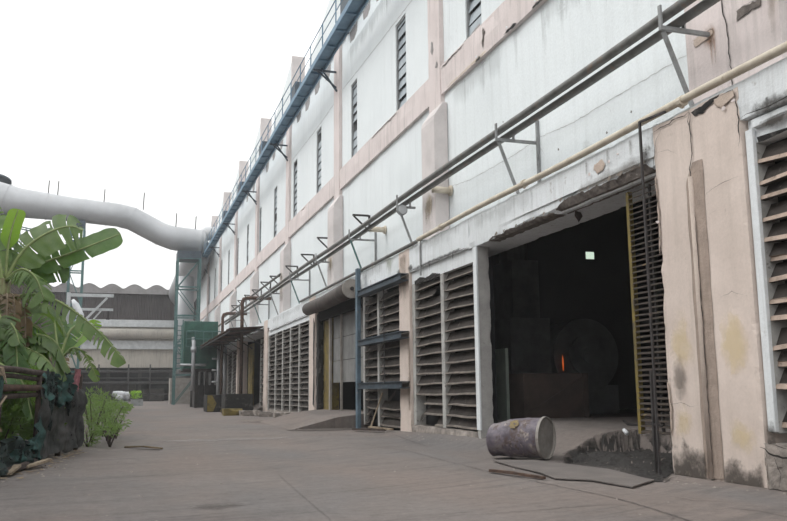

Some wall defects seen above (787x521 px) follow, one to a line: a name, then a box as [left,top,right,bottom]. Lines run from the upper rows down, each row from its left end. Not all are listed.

spalling [736,0,761,22]
crack [721,0,787,146]
spalling [691,89,735,116]
crack [652,111,692,176]
spalling [489,153,661,255]
damp [674,445,707,479]
crack [761,447,787,486]